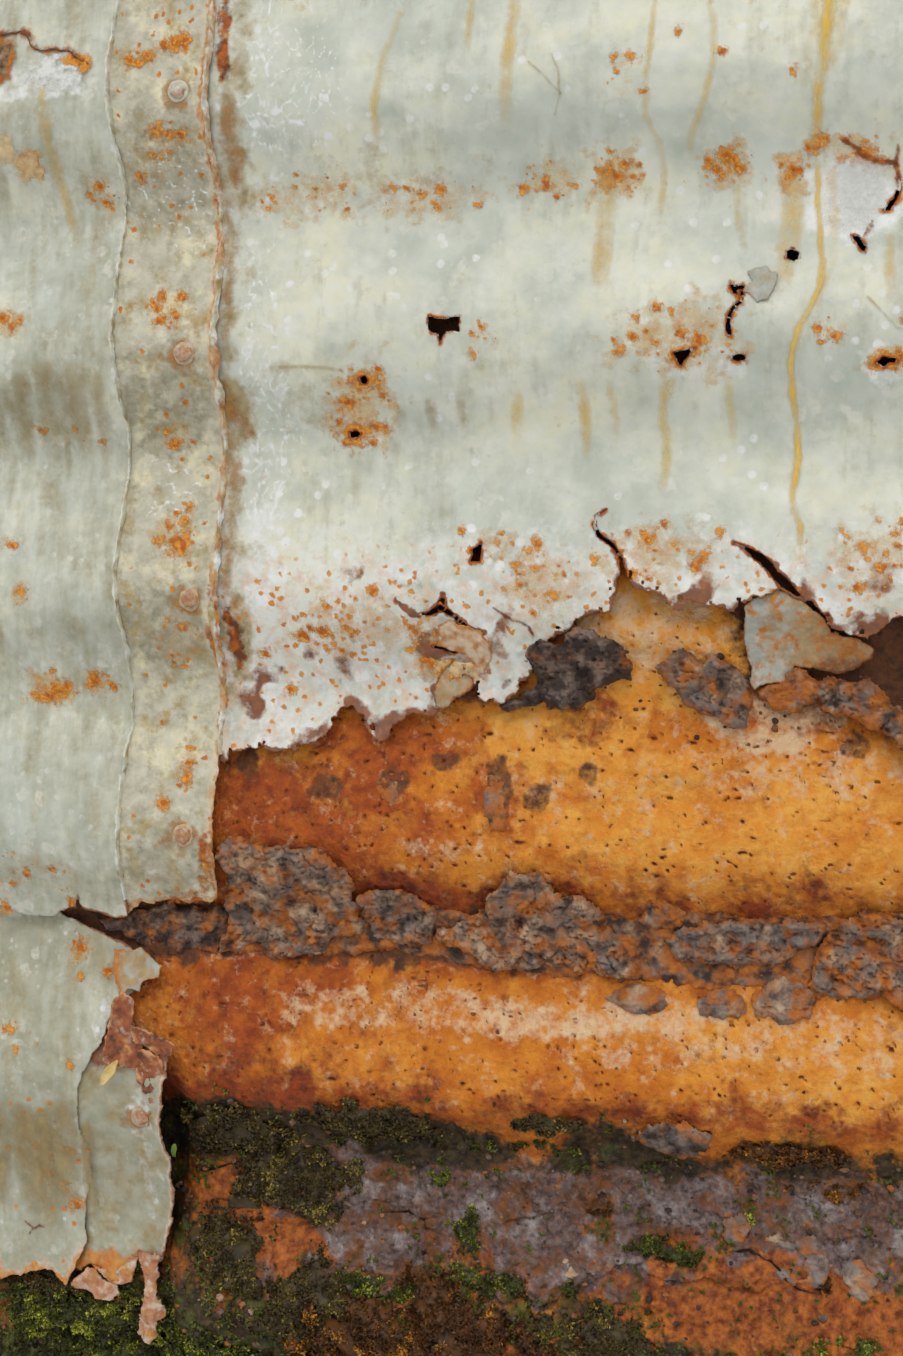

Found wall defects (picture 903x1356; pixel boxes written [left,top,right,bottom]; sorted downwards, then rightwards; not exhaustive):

corrosion [212,0,232,82]
water stain [814,0,834,131]
water stain [788,165,825,500]
corrosion [294,583,389,656]
peeling [433,619,492,709]
corrosion [499,625,633,712]
corrosion [655,648,903,751]
peeling [744,590,874,690]
corrosion [96,798,903,1025]
peeling [113,947,162,994]
corrosion [102,991,175,1127]
water stain [0,1105,93,1198]